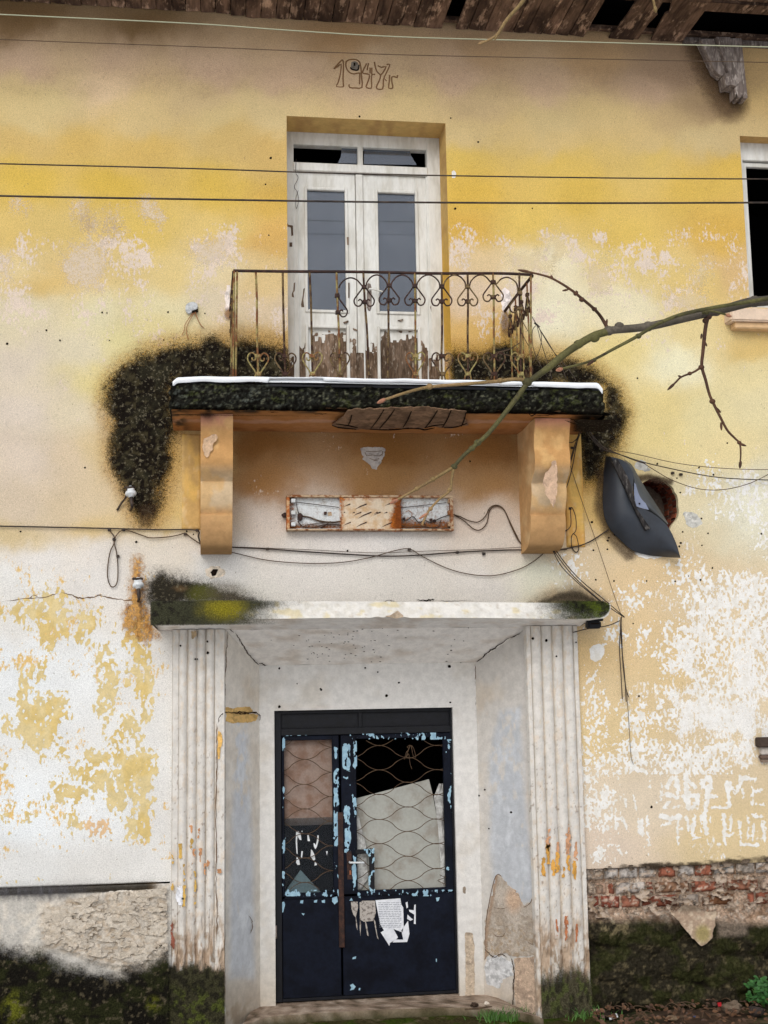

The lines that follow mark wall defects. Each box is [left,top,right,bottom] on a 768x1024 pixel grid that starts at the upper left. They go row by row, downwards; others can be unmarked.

water stain [99,330,289,528]
water stain [448,341,631,487]
corrosion [123,557,159,642]
water stain [144,569,257,604]
water stain [538,589,597,603]
peeling [0,580,160,845]
peeling [541,453,768,946]
crack [215,631,266,941]
spalling [465,874,536,1014]